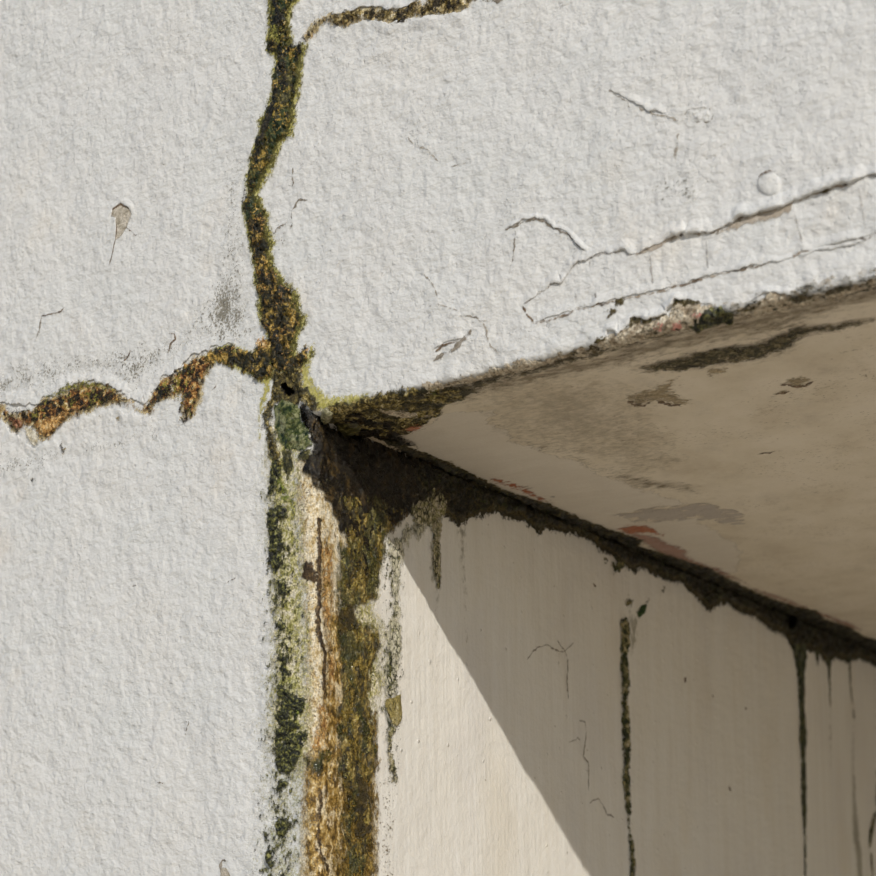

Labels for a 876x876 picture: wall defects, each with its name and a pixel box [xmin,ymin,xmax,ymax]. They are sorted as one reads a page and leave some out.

crack [609,86,678,121]
crack [0,0,501,476]
crack [505,212,588,261]
peeling [420,160,876,395]
water stain [302,424,876,876]